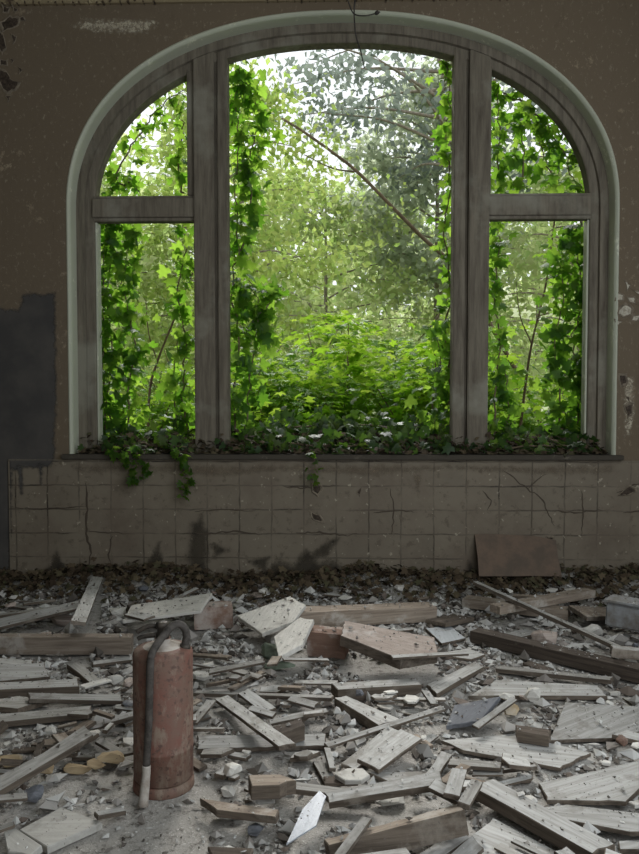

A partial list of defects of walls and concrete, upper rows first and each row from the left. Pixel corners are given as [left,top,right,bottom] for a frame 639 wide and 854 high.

crack [16,483,122,564]
crack [503,470,599,535]